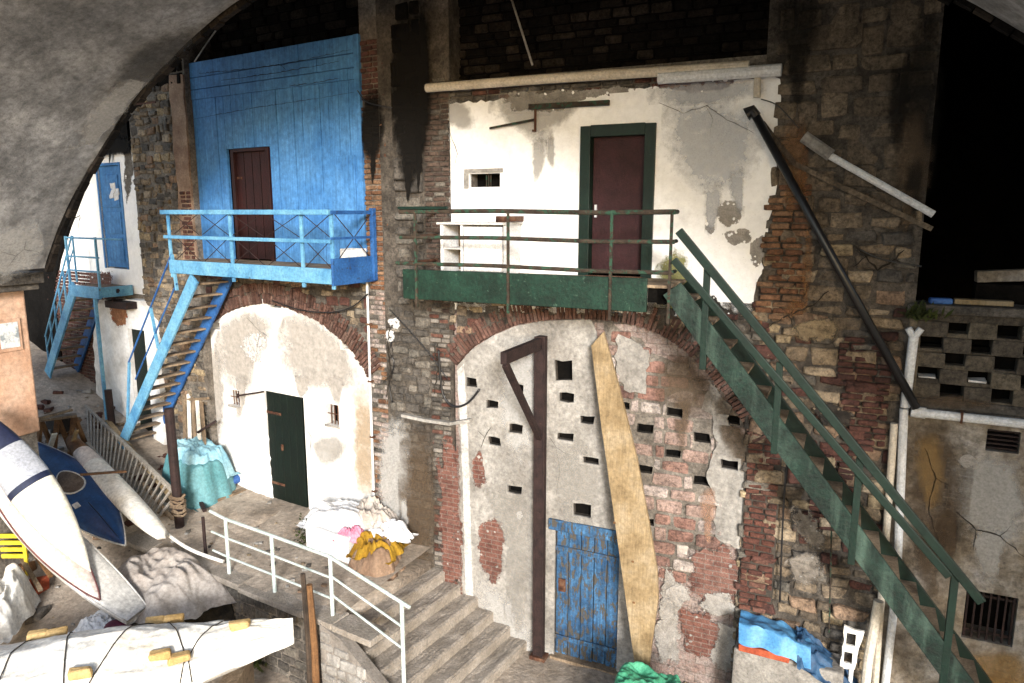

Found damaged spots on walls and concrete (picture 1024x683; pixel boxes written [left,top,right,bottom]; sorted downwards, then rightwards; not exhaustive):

damp [405,136,422,201]
crack [660,103,750,131]
damp [665,82,748,209]
damp [706,190,719,227]
flaking render [87,271,128,328]
flaking render [433,432,486,595]
crack [924,448,1024,557]
flaking render [477,517,505,584]
flaking render [674,544,740,660]